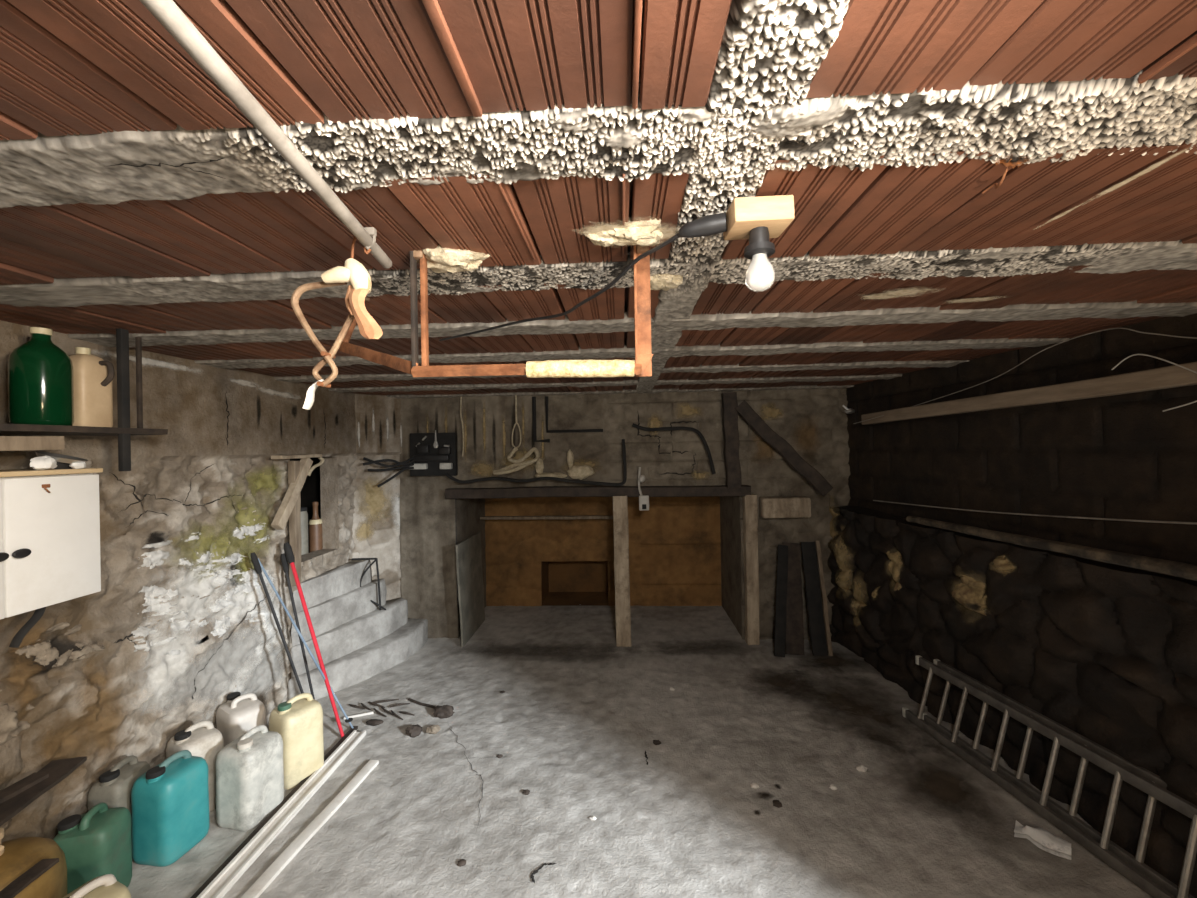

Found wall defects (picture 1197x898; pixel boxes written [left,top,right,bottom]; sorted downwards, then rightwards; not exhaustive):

crack [114,625,149,645]
flaking render [130,523,275,657]
crack [192,597,266,699]